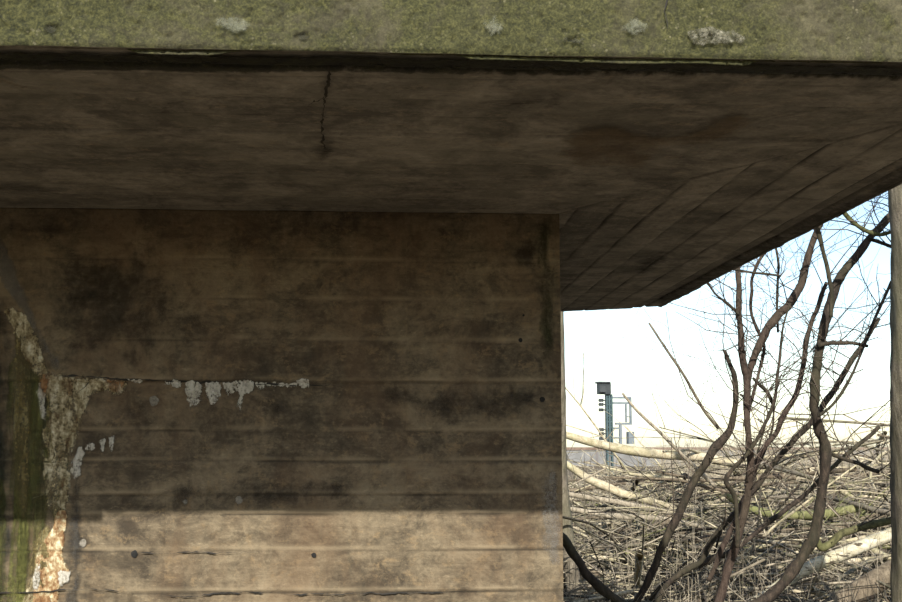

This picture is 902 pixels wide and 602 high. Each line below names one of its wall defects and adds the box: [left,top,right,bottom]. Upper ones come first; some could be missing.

crack [307,65,331,151]
leakage [0,248,68,602]
leakage [165,378,309,409]
peeling [33,437,114,602]
leakage [71,507,80,564]